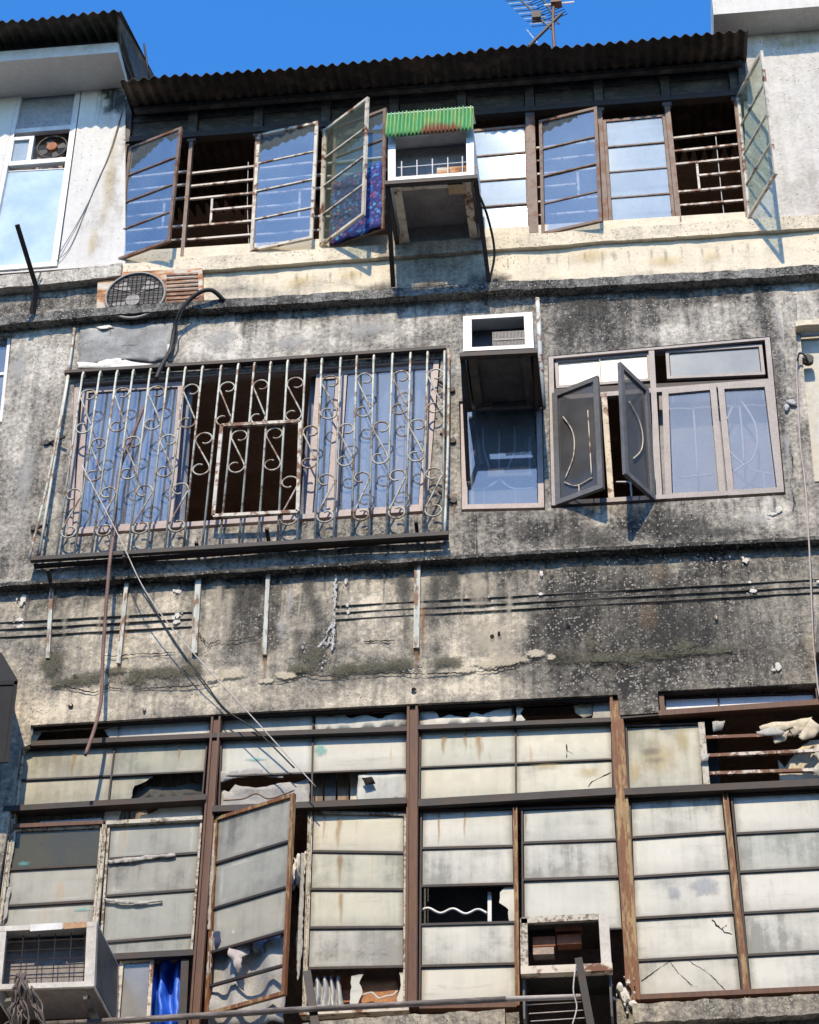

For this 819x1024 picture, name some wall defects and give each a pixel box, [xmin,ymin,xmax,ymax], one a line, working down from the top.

water stain [39,650,203,688]
flaking render [207,666,245,681]
flaking render [259,642,327,683]
water stain [277,622,465,678]
flaking render [457,649,556,673]
water stain [549,631,745,667]